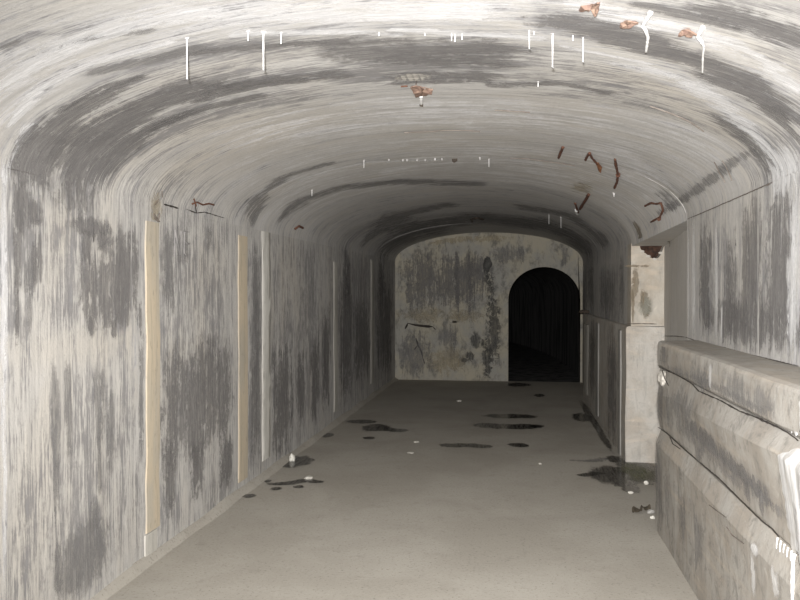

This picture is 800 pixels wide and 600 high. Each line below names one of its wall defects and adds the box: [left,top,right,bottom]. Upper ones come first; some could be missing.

crack [153,191,224,222]
damp [0,1,613,376]
damp [536,1,800,355]
damp [272,203,608,459]
damp [251,345,261,459]
crack [659,367,799,441]
crack [658,427,780,537]
crack [709,505,744,544]
damp [657,387,800,600]